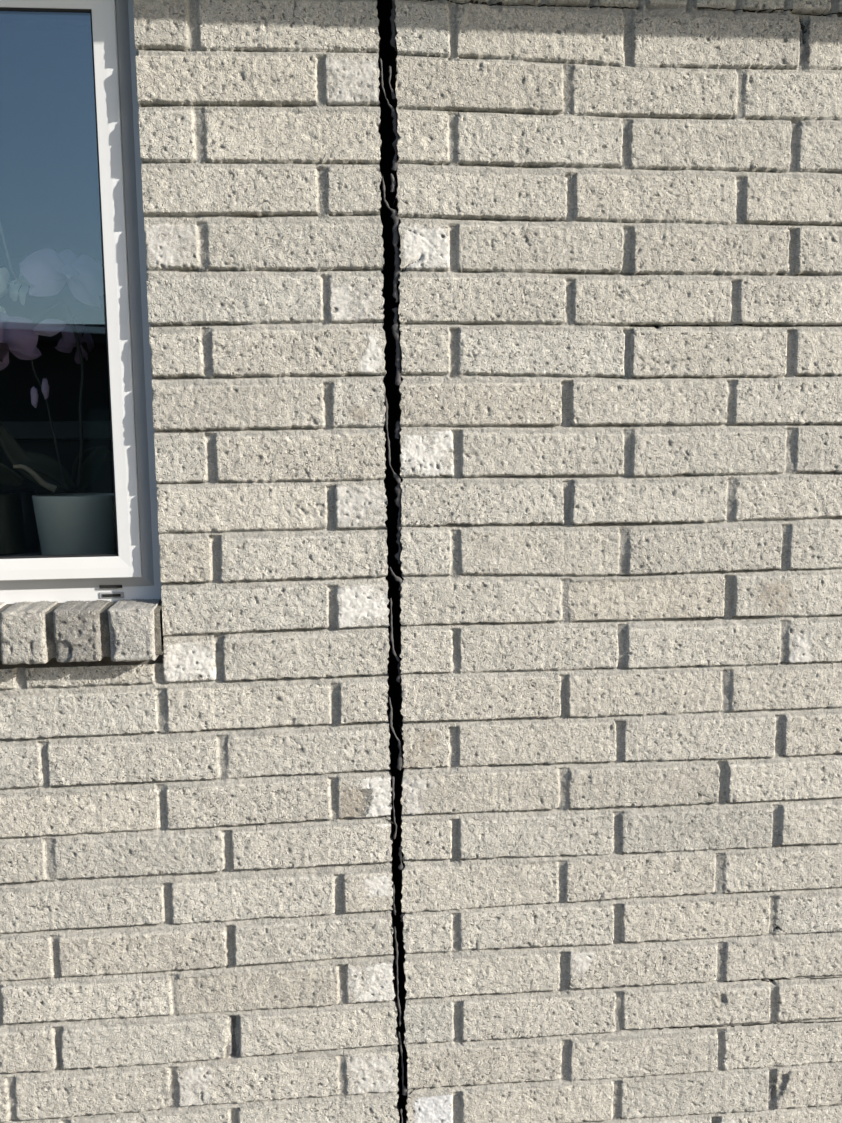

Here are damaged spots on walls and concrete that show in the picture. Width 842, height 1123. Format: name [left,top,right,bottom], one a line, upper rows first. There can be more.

crack [377,0,639,1123]